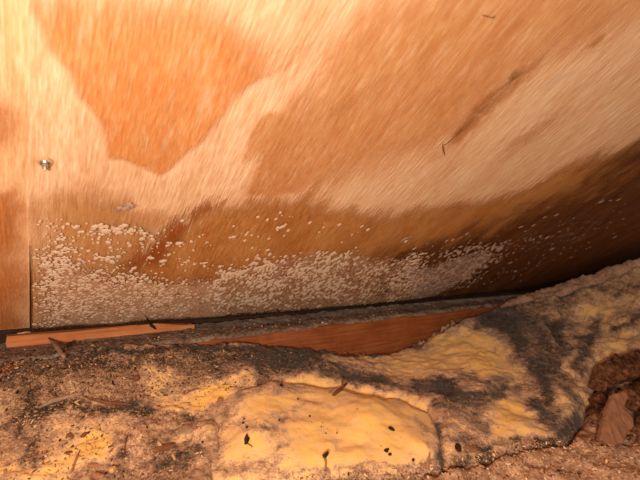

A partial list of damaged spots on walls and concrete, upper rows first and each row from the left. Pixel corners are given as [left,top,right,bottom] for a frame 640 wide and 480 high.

water stain [0,0,640,333]